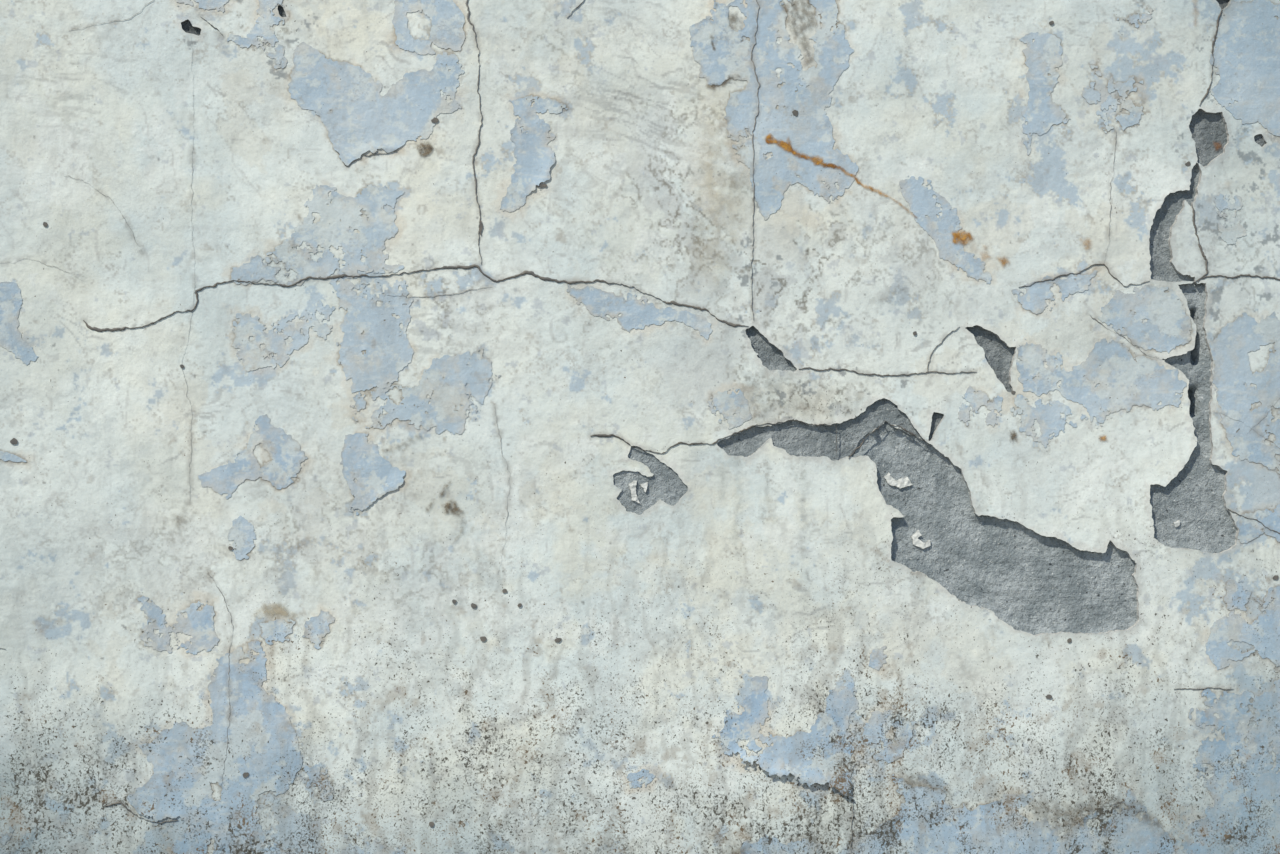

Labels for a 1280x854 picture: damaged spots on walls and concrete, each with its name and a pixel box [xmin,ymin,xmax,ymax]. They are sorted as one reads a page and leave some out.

peeling [175,0,229,36]
peeling [227,0,466,166]
crack [1199,7,1223,106]
corrosion [766,134,887,196]
crack [83,0,760,493]
crack [1021,138,1150,287]
crack [1192,205,1280,282]
crack [802,329,973,377]
flaking render [689,0,1280,635]
crack [591,419,928,457]
flaking render [613,446,688,515]